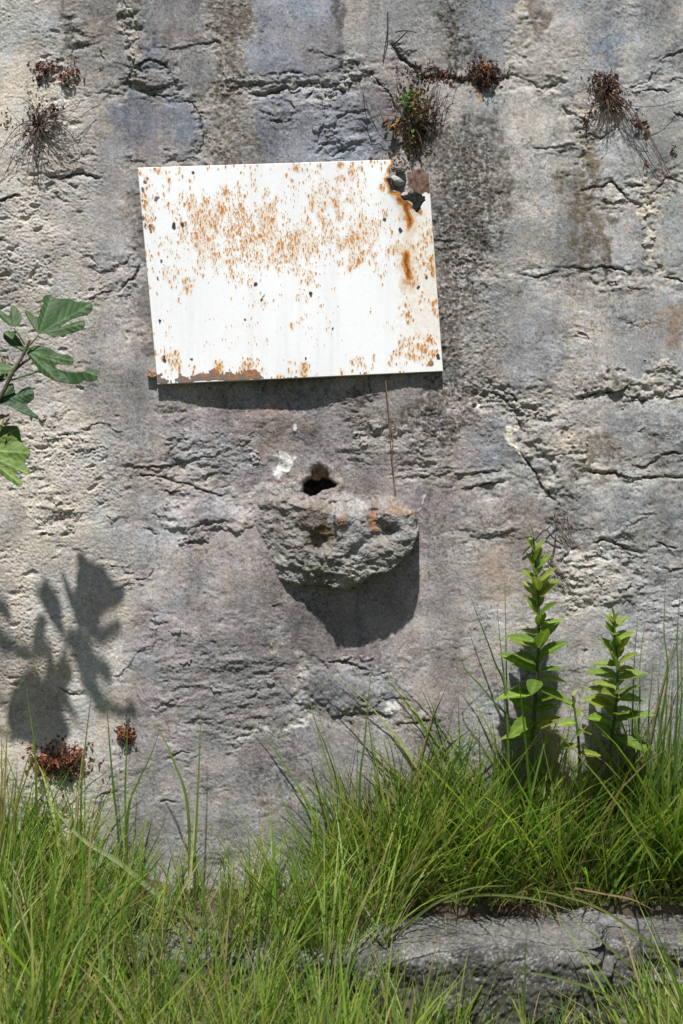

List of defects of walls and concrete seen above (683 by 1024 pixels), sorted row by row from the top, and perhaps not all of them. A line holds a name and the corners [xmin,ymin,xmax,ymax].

crack [103,0,218,163]
rust [138,160,438,375]
crack [520,265,683,290]
crack [395,390,683,505]